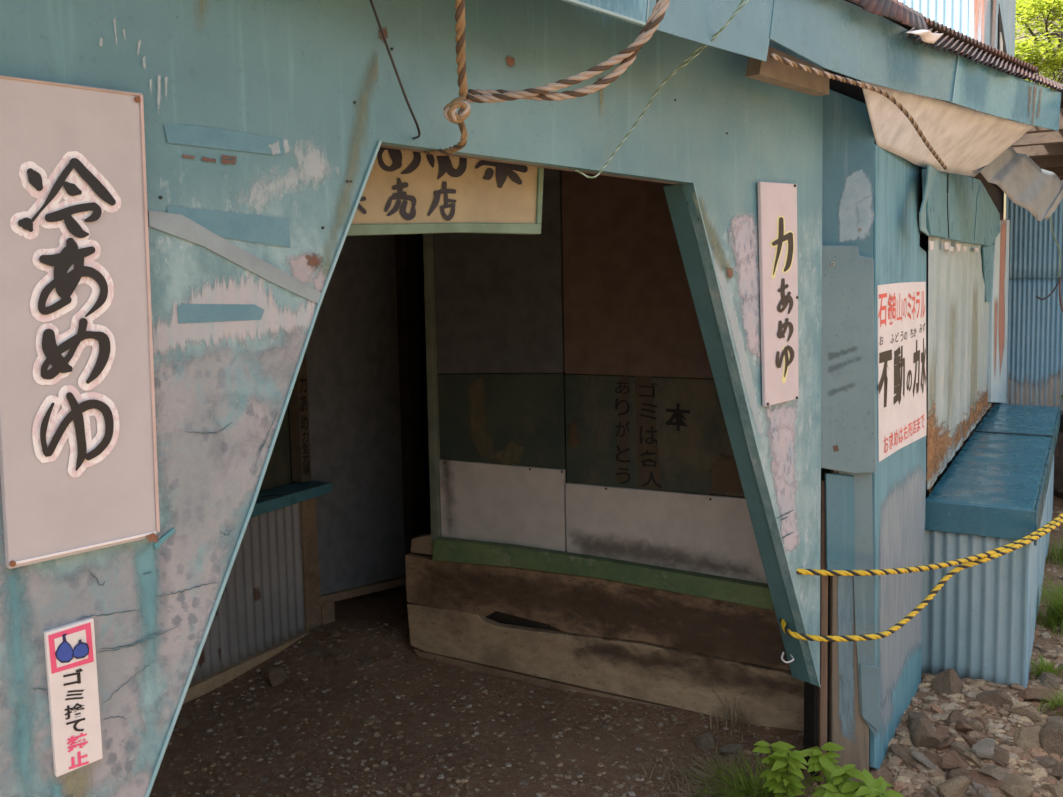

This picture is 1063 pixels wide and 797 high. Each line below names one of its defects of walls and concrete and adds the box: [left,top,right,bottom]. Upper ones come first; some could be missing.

corrosion [974,0,996,48]
peeling [270,140,288,154]
peeling [839,169,874,242]
peeling [729,215,761,357]
corrosion [926,391,992,489]
peeling [153,254,324,728]
crack [78,610,139,619]
crack [143,571,211,596]
peeling [0,551,152,797]
crack [97,624,181,720]